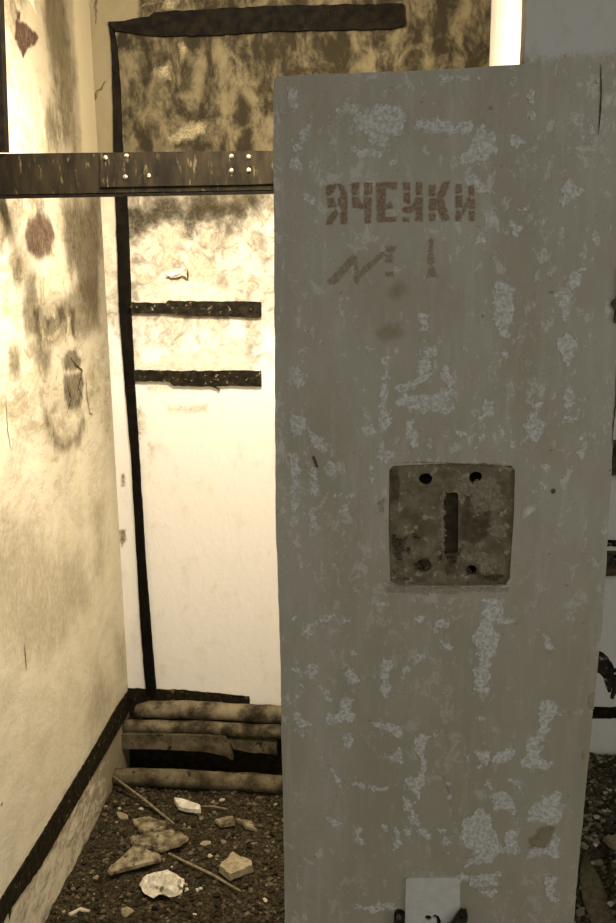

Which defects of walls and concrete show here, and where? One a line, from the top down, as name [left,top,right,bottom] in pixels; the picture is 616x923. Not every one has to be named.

peeling [335,103,498,199]
water stain [11,200,99,448]
peeling [354,313,460,448]
peeling [491,280,516,364]
peeling [546,267,586,421]
peeling [287,414,358,533]
spalling [419,473,432,484]
spalling [469,472,482,483]
corrosion [392,533,463,580]
peeling [471,598,516,693]
peeling [291,663,356,749]
peeling [381,699,566,899]